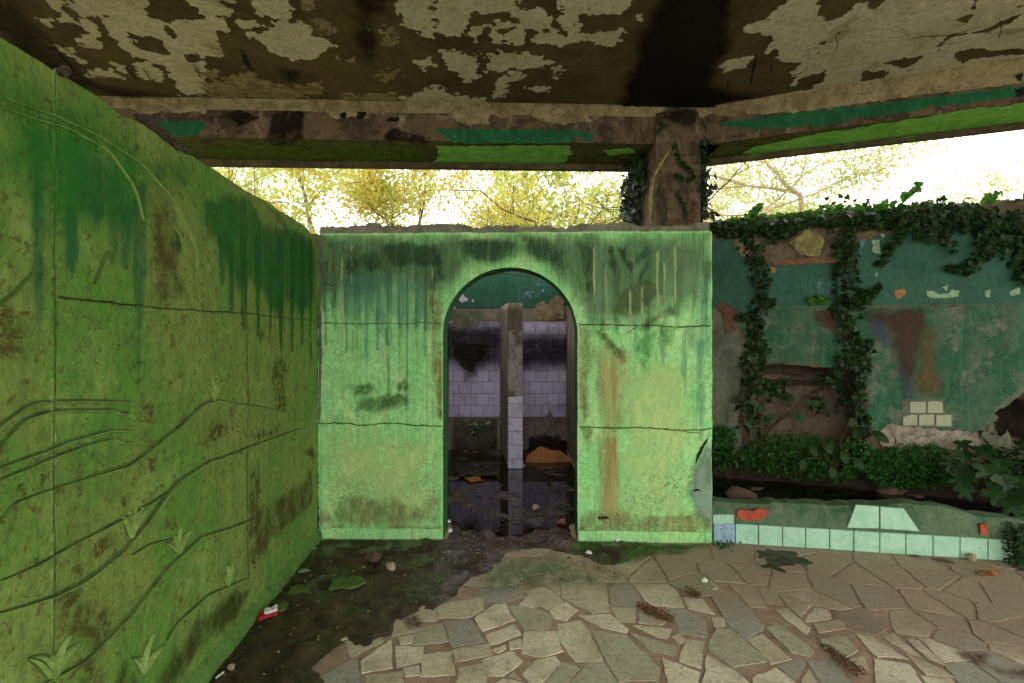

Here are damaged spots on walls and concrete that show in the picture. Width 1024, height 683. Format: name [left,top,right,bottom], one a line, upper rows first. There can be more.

peeling [34,0,357,155]
water stain [226,110,259,125]
water stain [265,111,304,146]
peeling [326,0,643,164]
water stain [620,0,749,126]
peeling [710,0,1024,155]
water stain [17,93,164,326]
water stain [206,198,711,416]
crack [52,193,441,655]
corrosion [598,352,621,519]
spalling [879,386,1024,460]